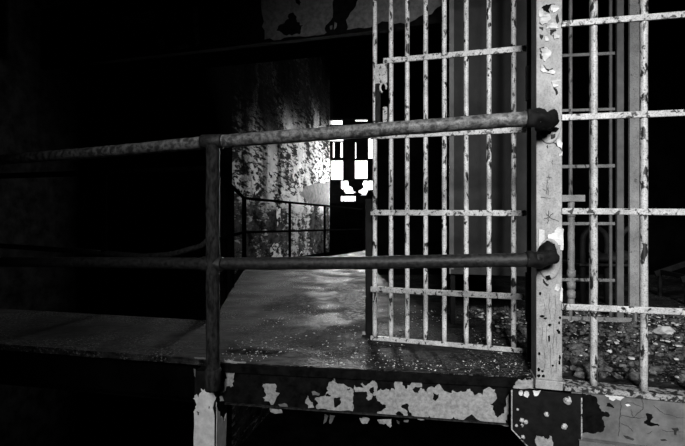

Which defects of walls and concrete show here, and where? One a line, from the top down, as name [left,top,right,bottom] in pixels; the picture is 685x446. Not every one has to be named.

peeling [261,0,337,40]
peeling [539,4,561,95]
peeling [193,372,235,446]
peeling [263,383,288,414]
peeling [305,368,545,427]
peeling [581,393,630,434]
peeling [535,435,553,446]